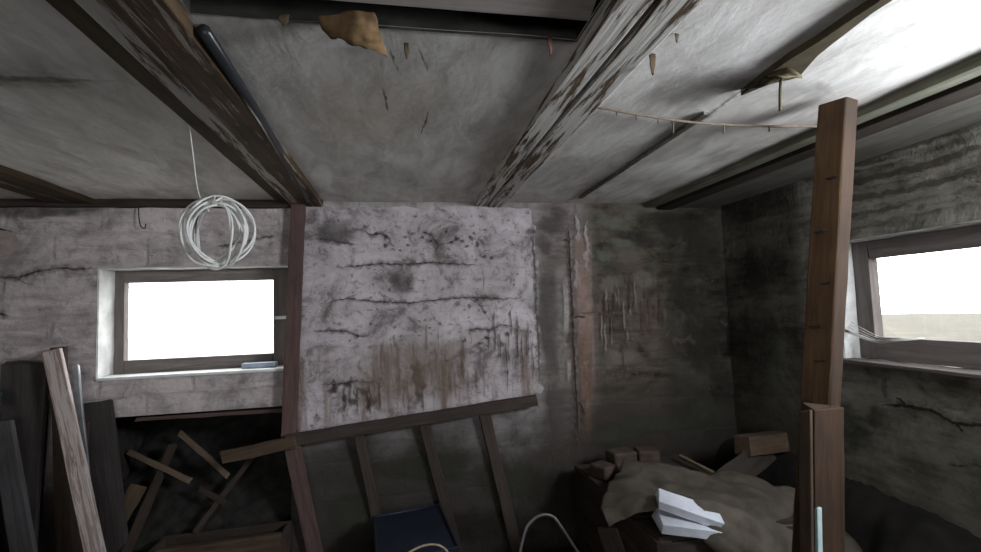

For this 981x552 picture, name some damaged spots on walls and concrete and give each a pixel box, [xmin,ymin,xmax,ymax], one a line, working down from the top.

crack [5,267,84,285]
crack [320,232,507,344]
leakage [540,278,570,369]
crack [886,397,981,432]